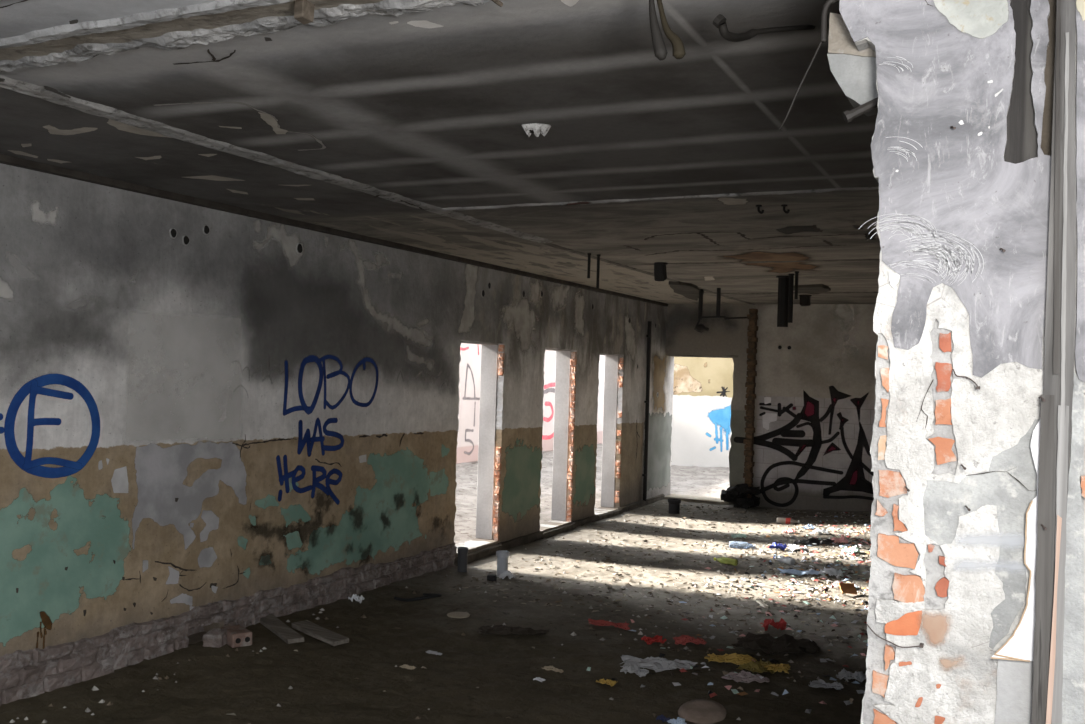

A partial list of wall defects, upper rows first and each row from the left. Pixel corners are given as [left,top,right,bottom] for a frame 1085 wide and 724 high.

spalling [0,0,503,82]
peeling [933,0,1009,39]
peeling [8,143,70,163]
peeling [43,119,172,138]
peeling [184,175,248,194]
flaking render [31,200,58,224]
peeling [0,458,131,647]
flaking render [198,510,219,568]
peeling [249,444,450,575]
flaking render [863,319,1040,724]
flaking render [142,560,194,610]